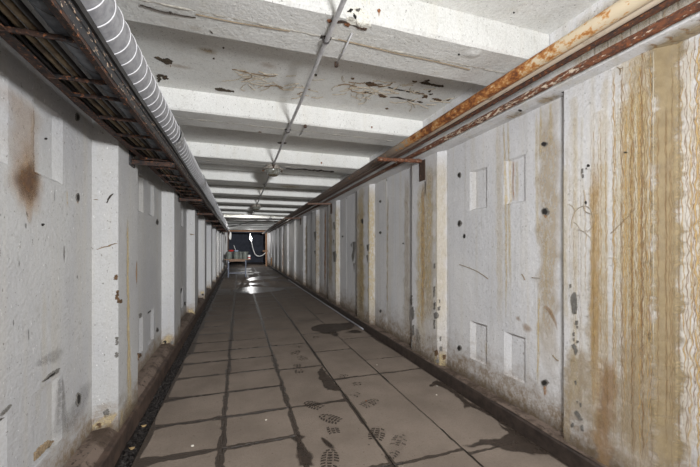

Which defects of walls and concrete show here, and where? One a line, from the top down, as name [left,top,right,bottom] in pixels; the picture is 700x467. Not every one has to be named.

spalling [327,0,371,31]
crack [225,69,455,111]
corrosion [18,160,36,198]
damp [600,24,700,467]
peeling [569,284,579,355]